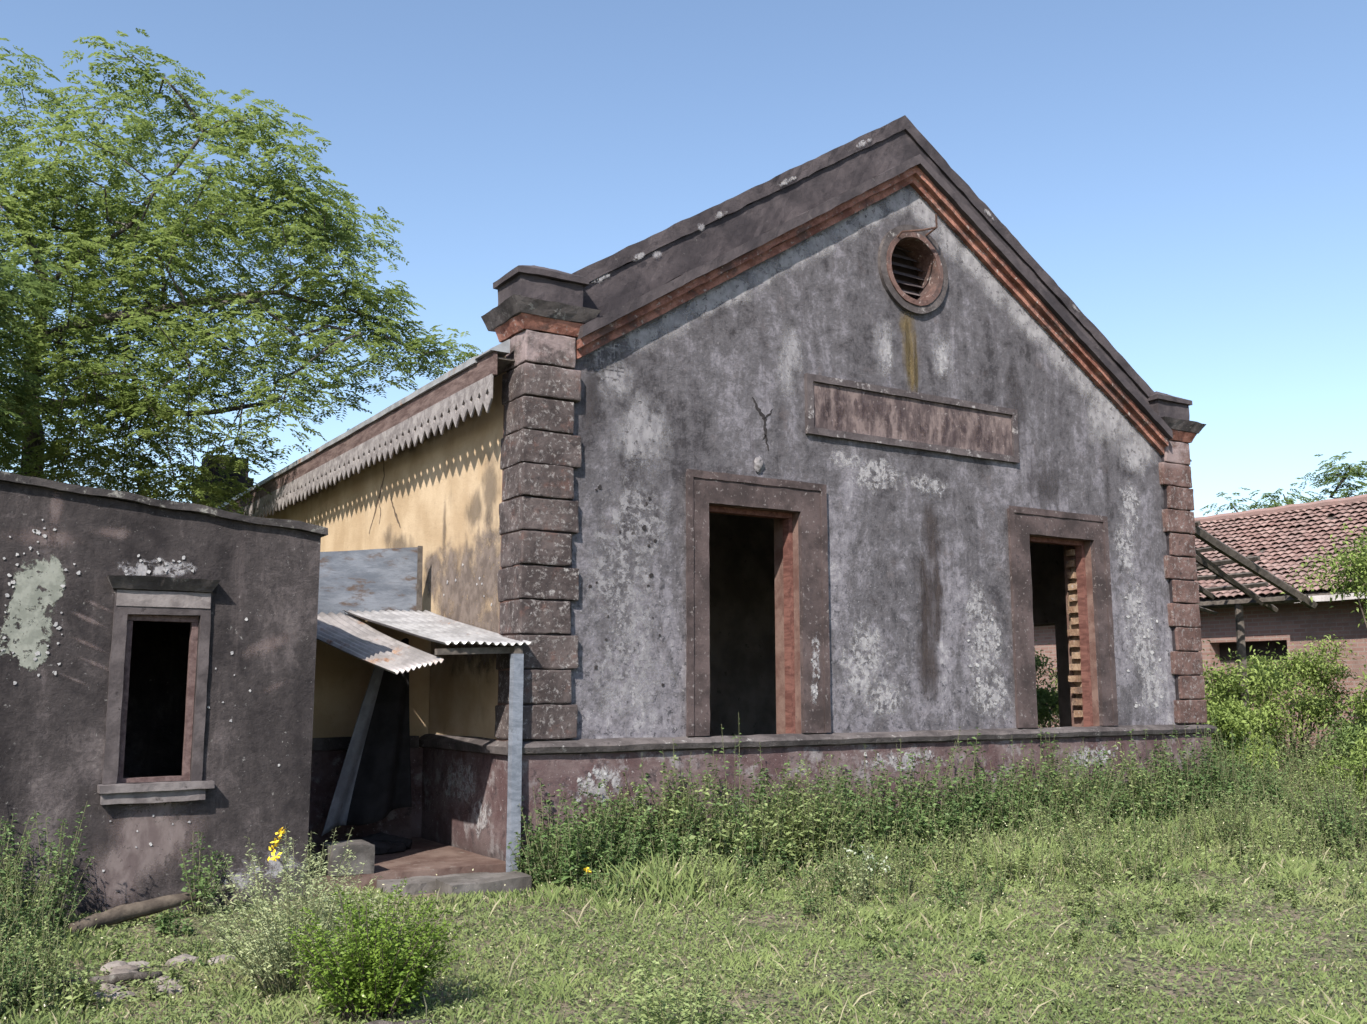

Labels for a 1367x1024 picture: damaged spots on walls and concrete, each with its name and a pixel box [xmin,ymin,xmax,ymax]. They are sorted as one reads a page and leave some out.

corrosion [901,316,918,388]
crack [752,397,773,451]
peeling [3,519,67,613]
peeling [119,554,194,577]
water stain [921,514,940,685]
peeling [33,612,63,677]
peeling [576,766,620,802]